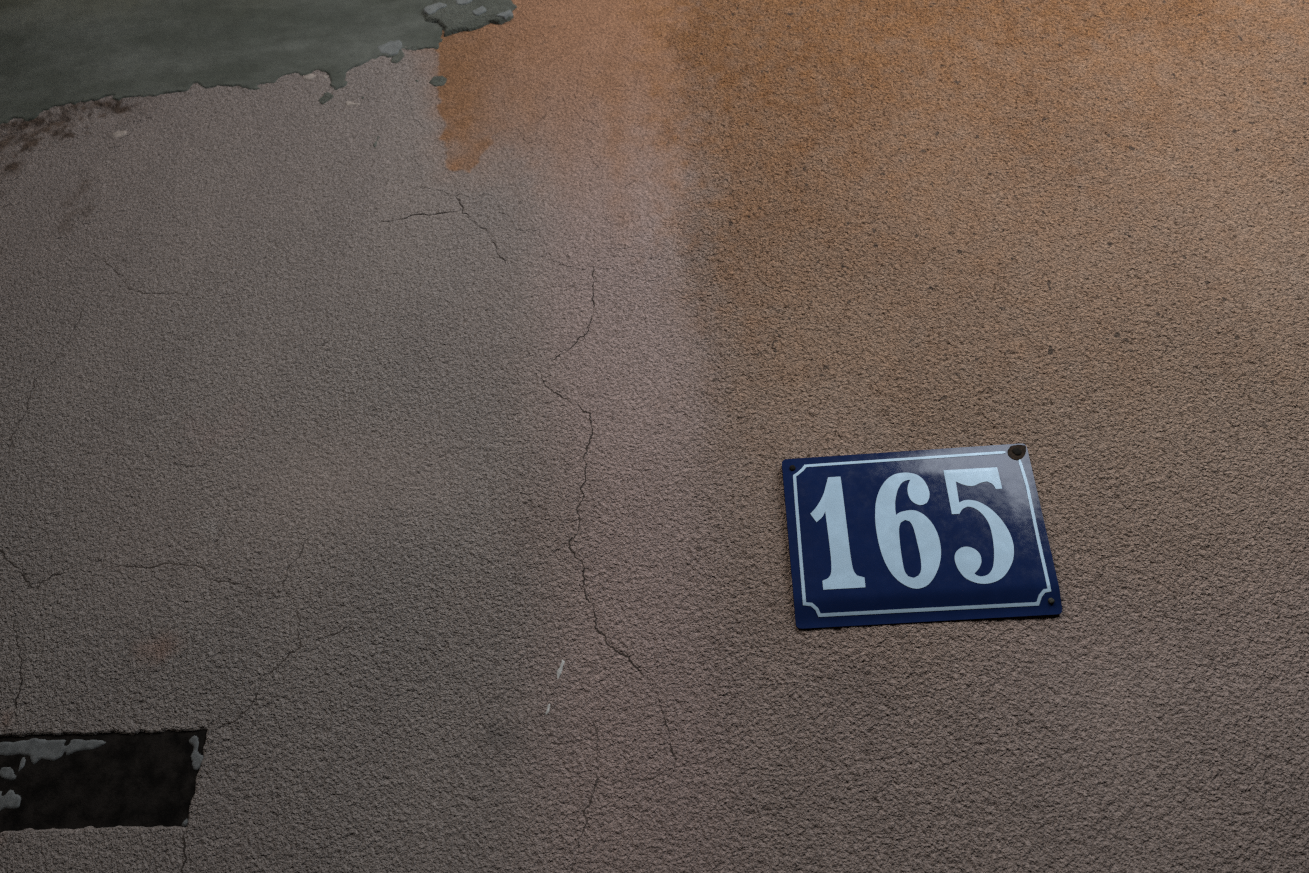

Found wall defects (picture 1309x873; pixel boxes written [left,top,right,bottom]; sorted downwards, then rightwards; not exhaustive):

peeling [423,0,513,20]
crack [387,184,506,263]
crack [542,233,676,873]